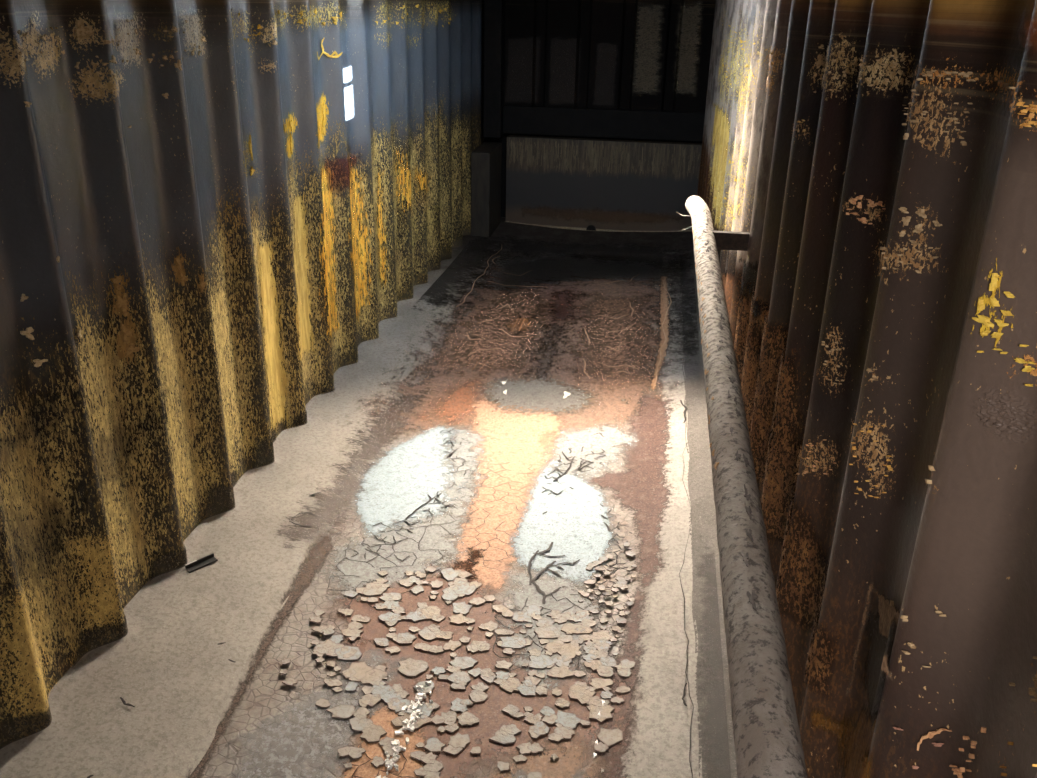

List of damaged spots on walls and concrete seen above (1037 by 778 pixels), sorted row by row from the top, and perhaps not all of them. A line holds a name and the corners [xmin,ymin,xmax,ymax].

corrosion [0,540,53,720]
corrosion [59,520,126,648]
corrosion [187,529,334,778]
corrosion [257,150,430,430]
water stain [278,387,487,600]
water stain [495,423,639,689]
corrosion [692,103,900,743]
peeling [970,258,1037,387]